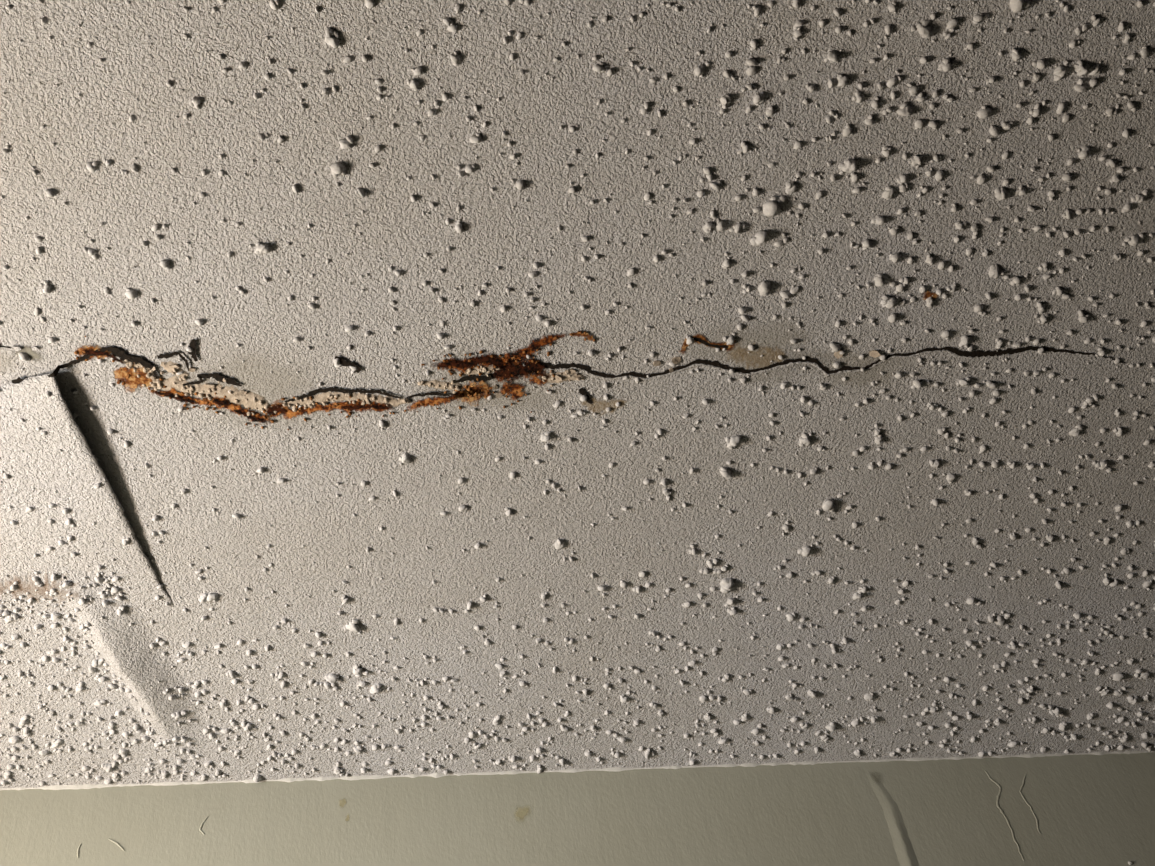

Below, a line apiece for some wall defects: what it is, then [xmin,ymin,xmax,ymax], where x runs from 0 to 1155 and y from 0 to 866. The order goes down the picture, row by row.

crack [47,339,242,387]
rust [74,331,596,430]
crack [285,356,495,403]
crack [538,337,1126,404]